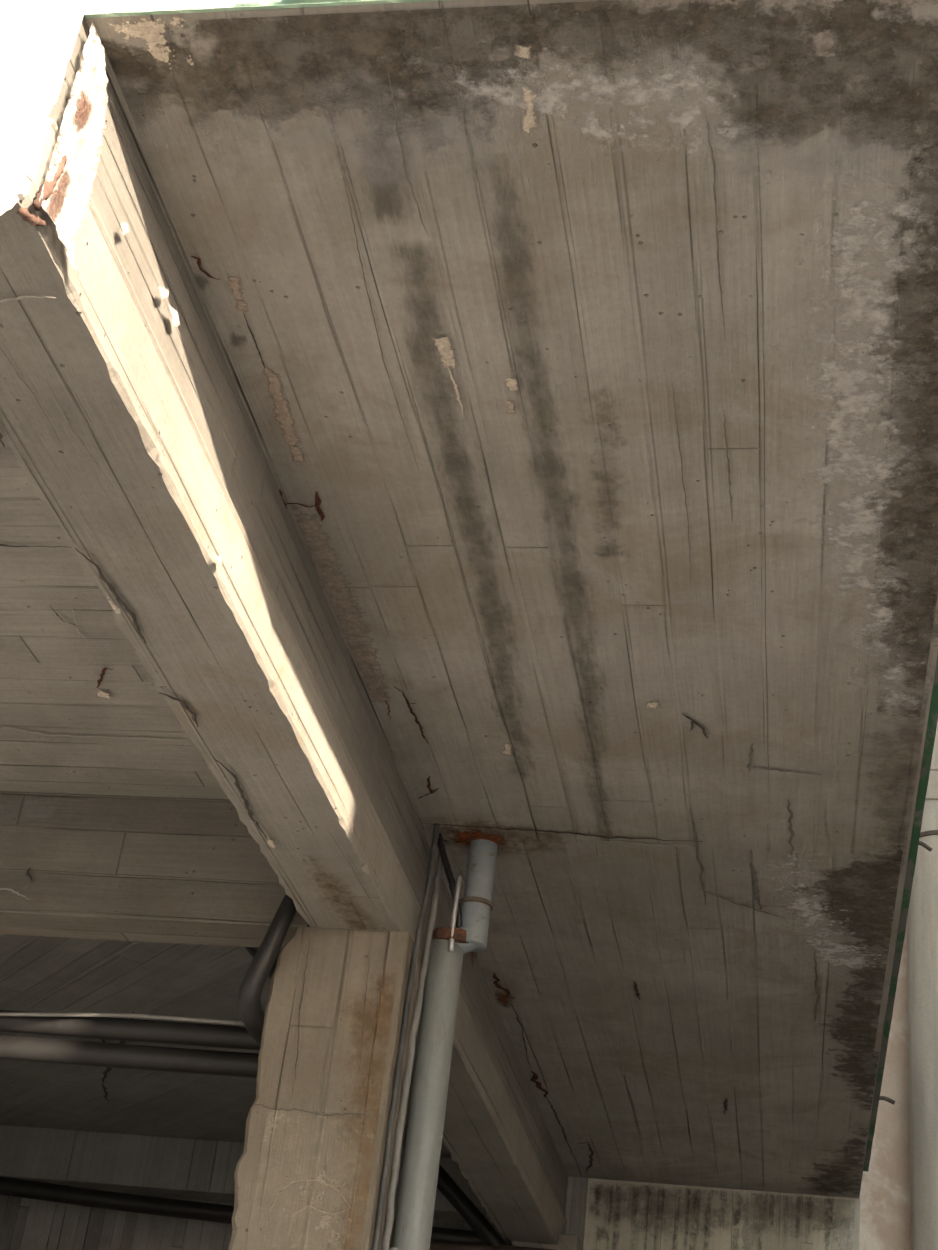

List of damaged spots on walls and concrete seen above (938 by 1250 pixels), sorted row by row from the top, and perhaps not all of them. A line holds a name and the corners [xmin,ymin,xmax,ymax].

rust [16,153,67,227]
spalling [39,17,194,269]
spalling [159,287,180,327]
leakage [101,0,938,716]
crack [385,687,428,743]
crack [682,713,708,738]
rust [443,822,552,853]
crack [418,775,785,919]
crack [746,744,832,856]
leakage [764,846,903,1110]
crack [493,974,594,1173]
leakage [771,1128,868,1238]